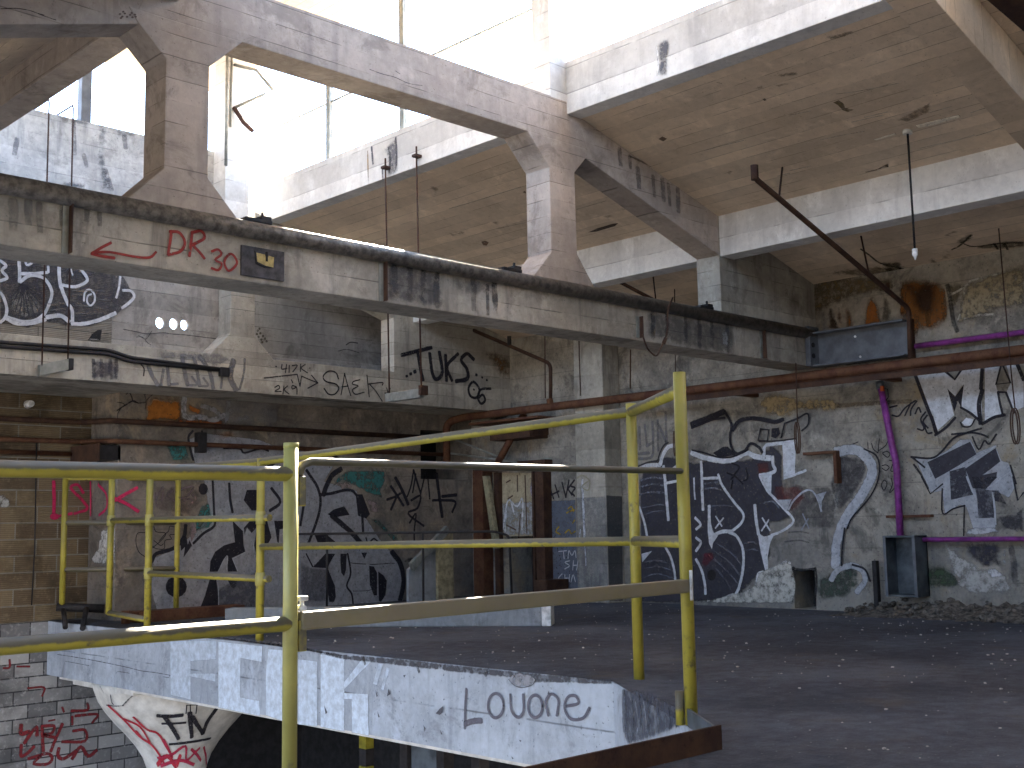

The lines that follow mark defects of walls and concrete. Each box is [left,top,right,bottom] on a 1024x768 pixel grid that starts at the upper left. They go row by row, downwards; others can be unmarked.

damp [618,148,680,212]
damp [389,265,441,304]
damp [486,282,498,315]
corrosion [829,281,947,333]
peeling [707,560,817,604]
peeling [947,548,1010,594]